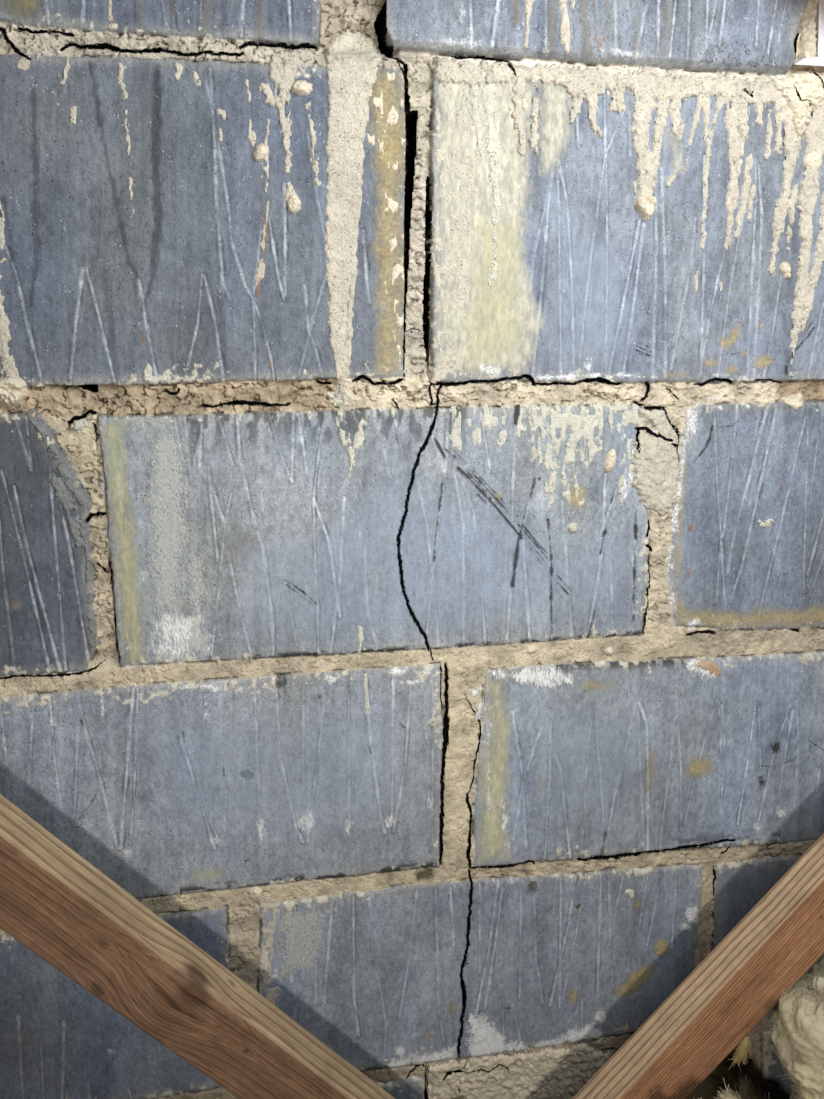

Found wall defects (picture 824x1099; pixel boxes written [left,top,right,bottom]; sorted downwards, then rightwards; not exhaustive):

crack [0,27,316,59]
crack [317,0,782,1099]